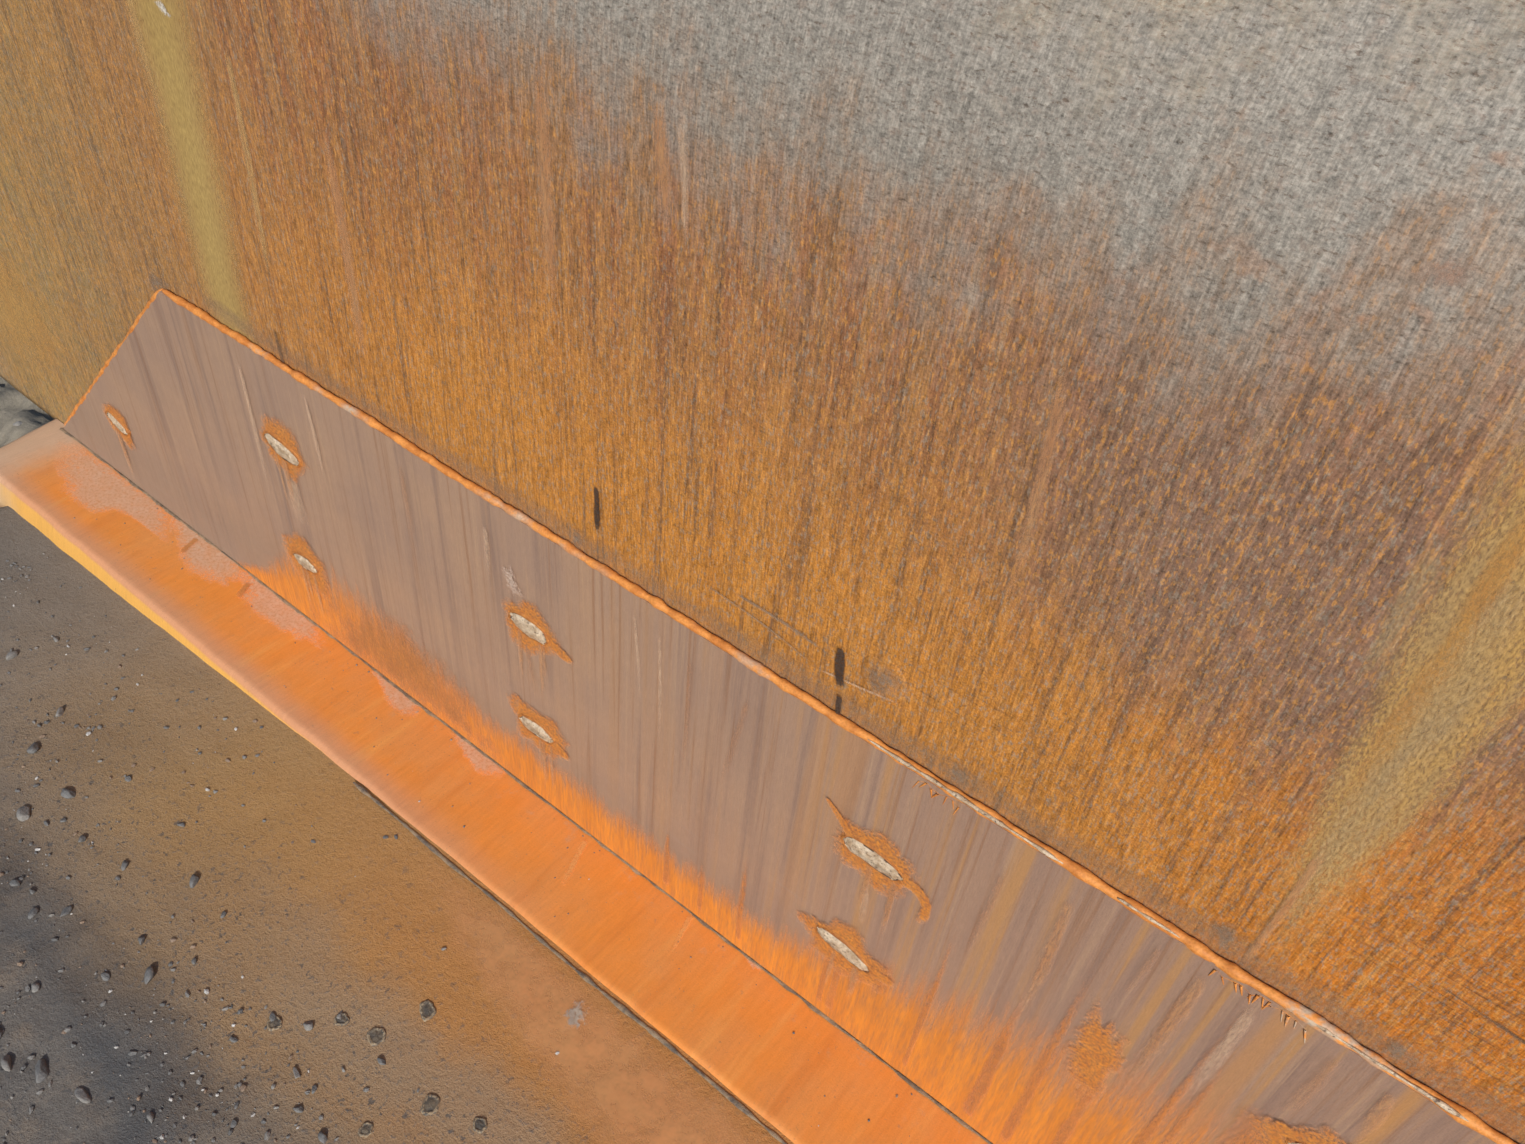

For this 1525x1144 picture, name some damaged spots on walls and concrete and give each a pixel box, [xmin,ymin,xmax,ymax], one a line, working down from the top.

corrosion [104,404,134,456]
corrosion [260,417,305,486]
corrosion [1250,463,1525,954]
corrosion [244,534,1208,1144]
corrosion [1231,1117,1346,1144]